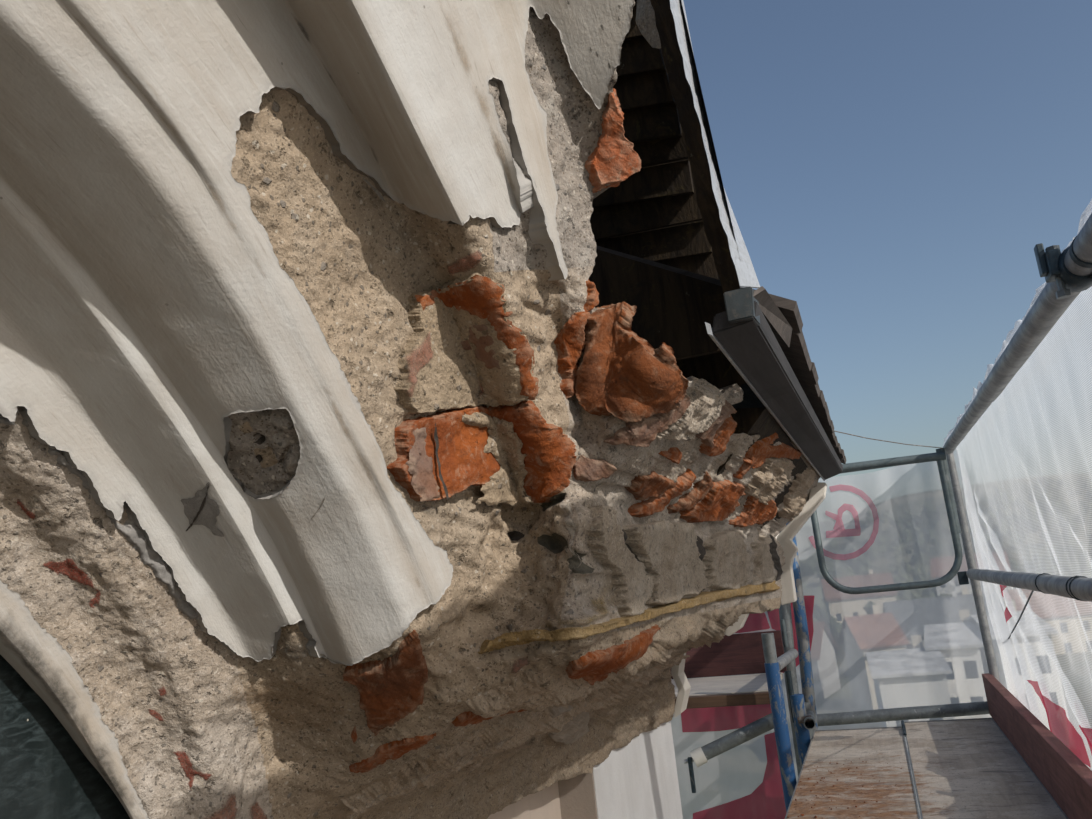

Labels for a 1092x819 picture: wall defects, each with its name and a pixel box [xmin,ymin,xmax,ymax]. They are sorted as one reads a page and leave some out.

spalling [0,8,820,819]